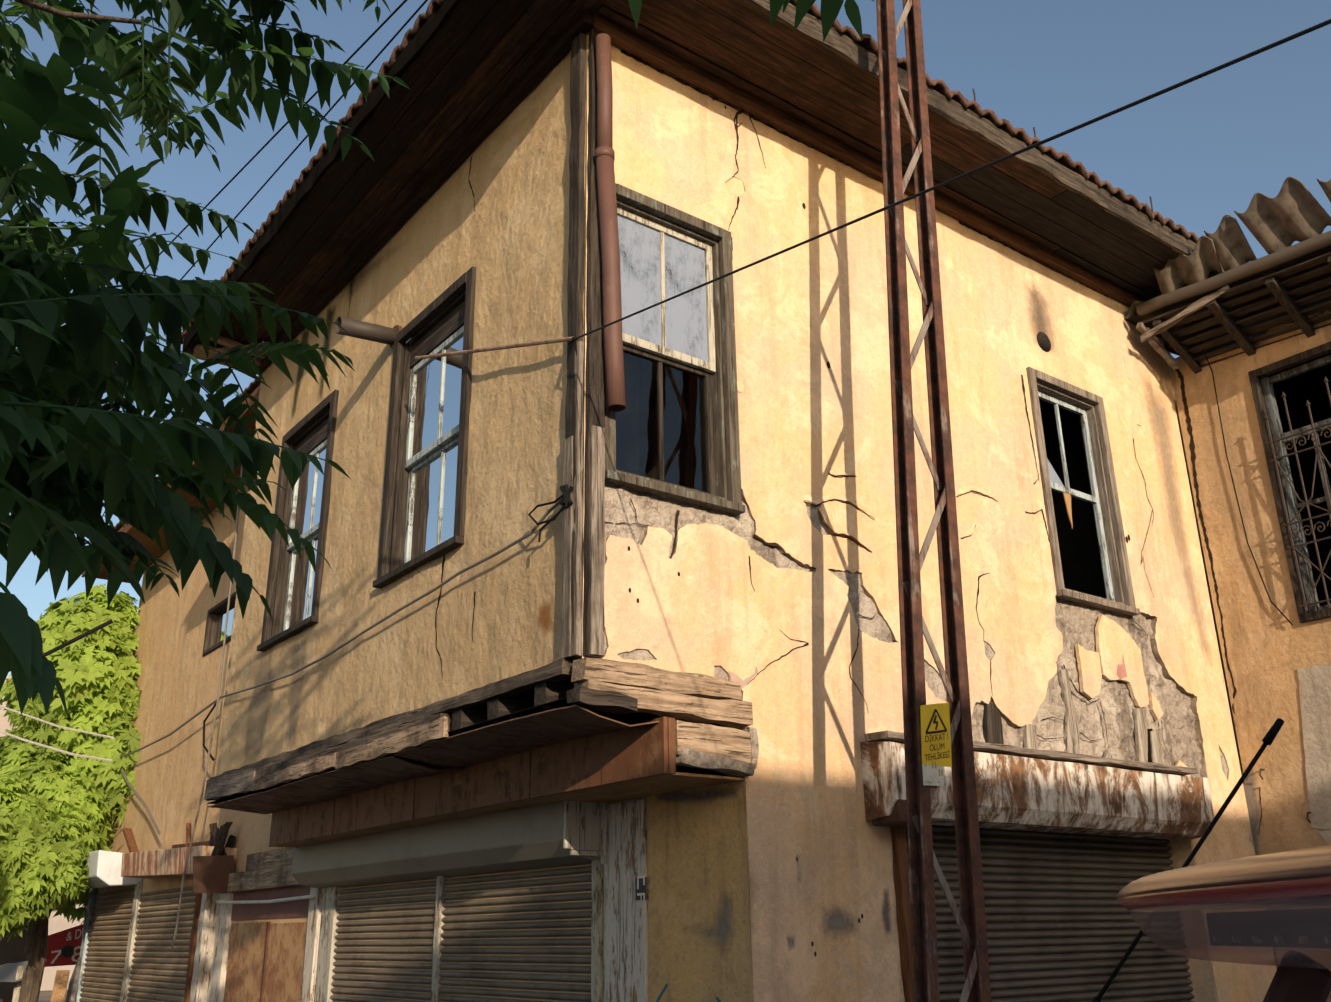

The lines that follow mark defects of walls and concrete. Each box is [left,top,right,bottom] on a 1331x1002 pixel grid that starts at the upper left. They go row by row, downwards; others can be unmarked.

crack [621,50,882,265]
crack [959,221,1107,297]
flaking render [604,483,899,643]
crack [976,573,988,630]
crack [747,629,809,685]
crack [849,629,869,713]
flaking render [971,597,1229,780]